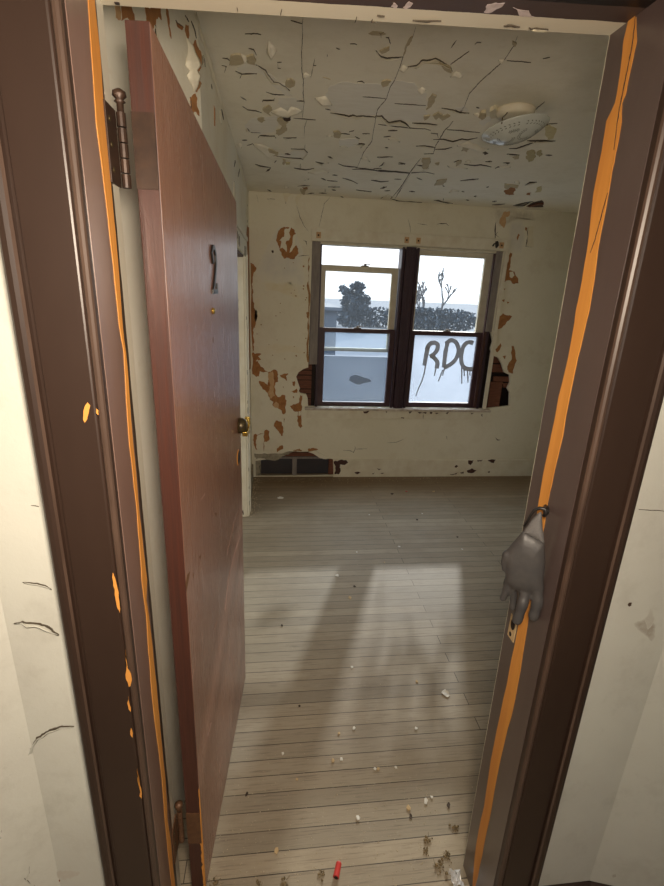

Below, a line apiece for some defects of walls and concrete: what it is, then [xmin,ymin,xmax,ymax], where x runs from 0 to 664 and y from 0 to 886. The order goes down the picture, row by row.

peeling [114,2,189,39]
peeling [222,48,308,172]
crack [185,12,550,238]
peeling [315,79,498,128]
peeling [237,205,348,474]
peeling [498,253,518,329]
peeling [537,15,637,531]
peeling [83,402,99,423]
peeling [88,0,175,886]
crack [14,621,59,636]
crack [22,582,52,590]
peeling [472,600,531,886]